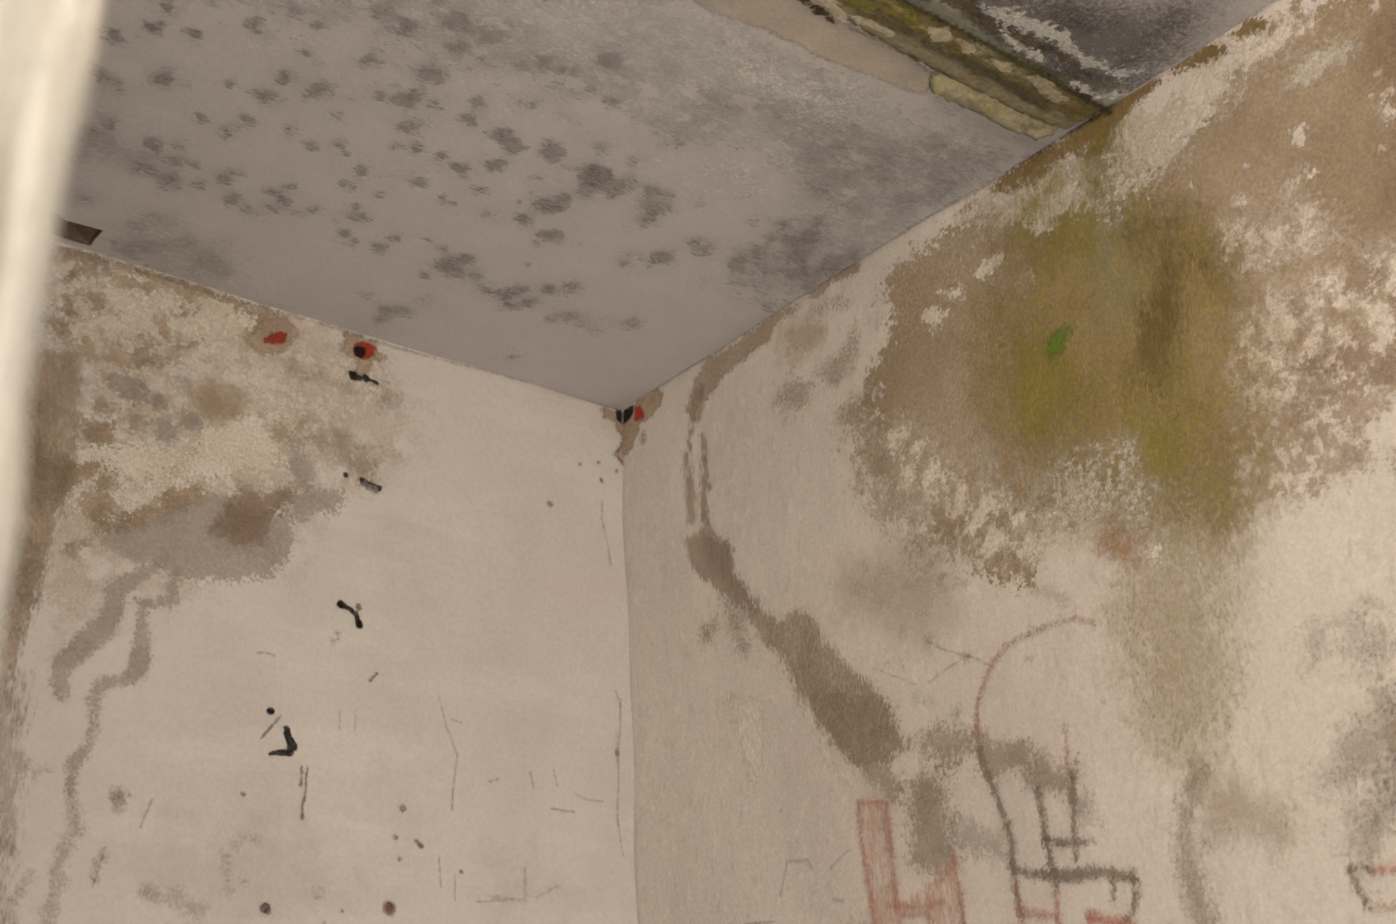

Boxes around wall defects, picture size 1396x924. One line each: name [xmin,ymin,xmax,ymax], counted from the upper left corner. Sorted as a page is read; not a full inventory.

spalling [694,0,1090,120]
leakage [0,349,378,924]
leakage [243,0,1089,883]